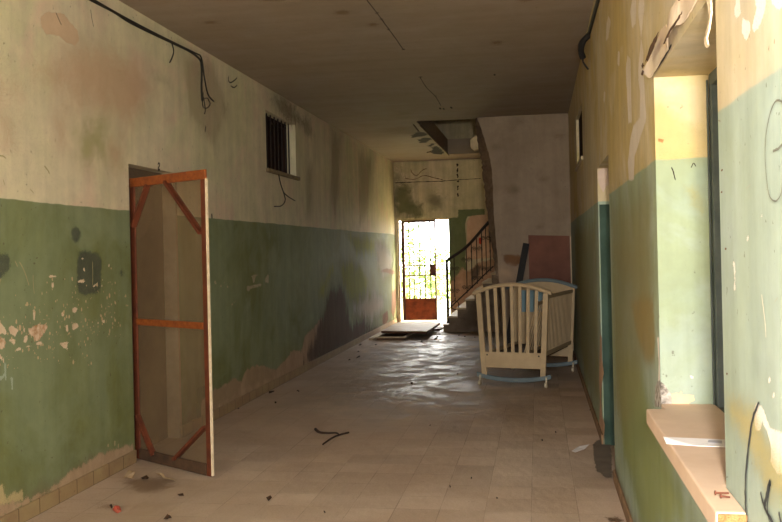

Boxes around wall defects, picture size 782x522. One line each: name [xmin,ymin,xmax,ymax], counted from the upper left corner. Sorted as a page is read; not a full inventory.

peeling [734,0,782,41]
peeling [617,0,713,182]
spalling [410,124,449,155]
damp [302,146,394,365]
peeling [0,257,121,369]
spalling [655,337,695,407]
peeling [754,404,782,475]
peeling [0,444,134,517]